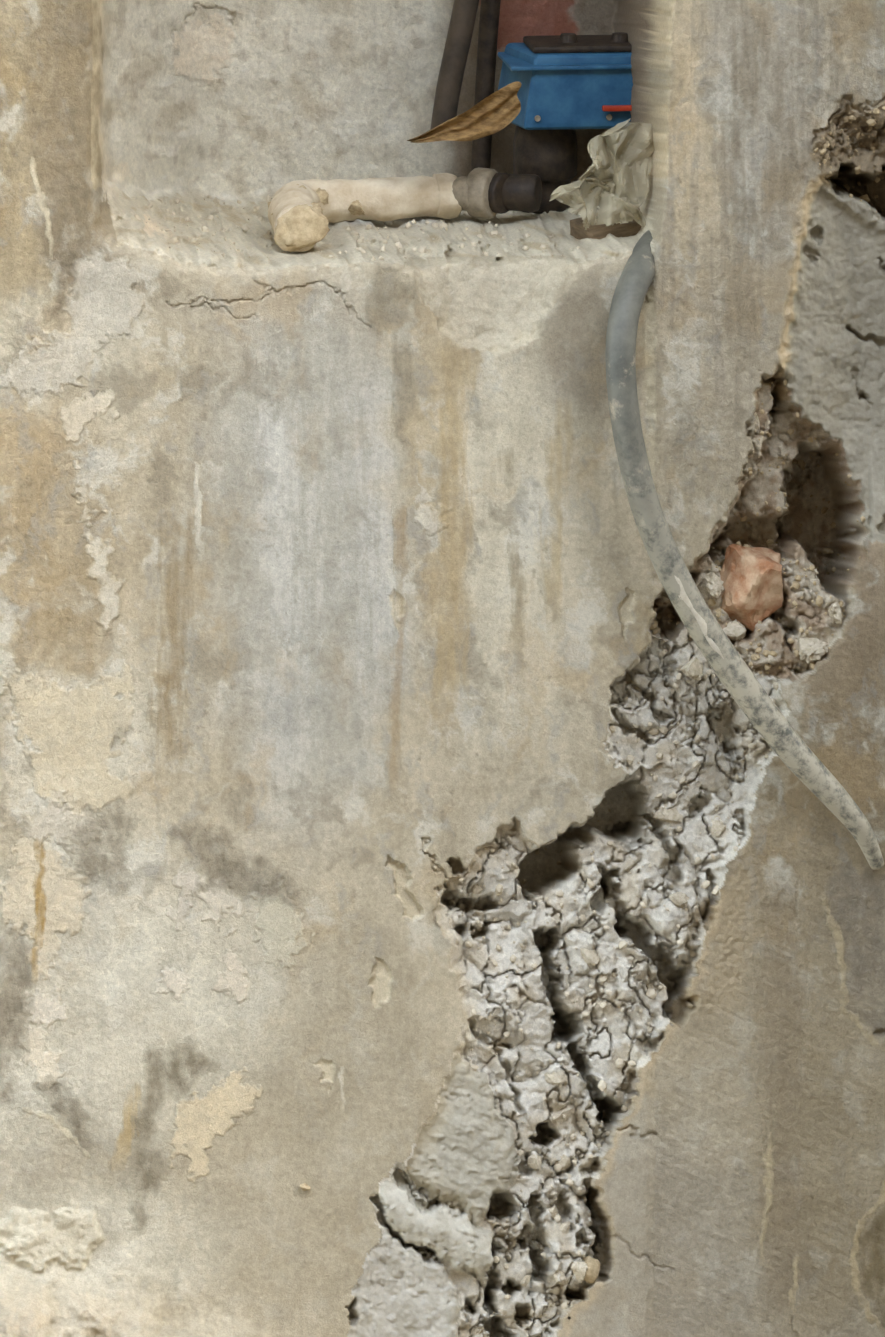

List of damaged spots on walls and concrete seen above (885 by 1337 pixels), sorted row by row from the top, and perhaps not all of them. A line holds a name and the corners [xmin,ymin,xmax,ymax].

spalling [810,93,885,218]
crack [167,276,370,330]
corrosion [29,837,48,984]
leakage [57,791,140,891]
leakage [166,815,305,913]
spalling [348,369,871,1337]
peeling [166,1065,264,1188]